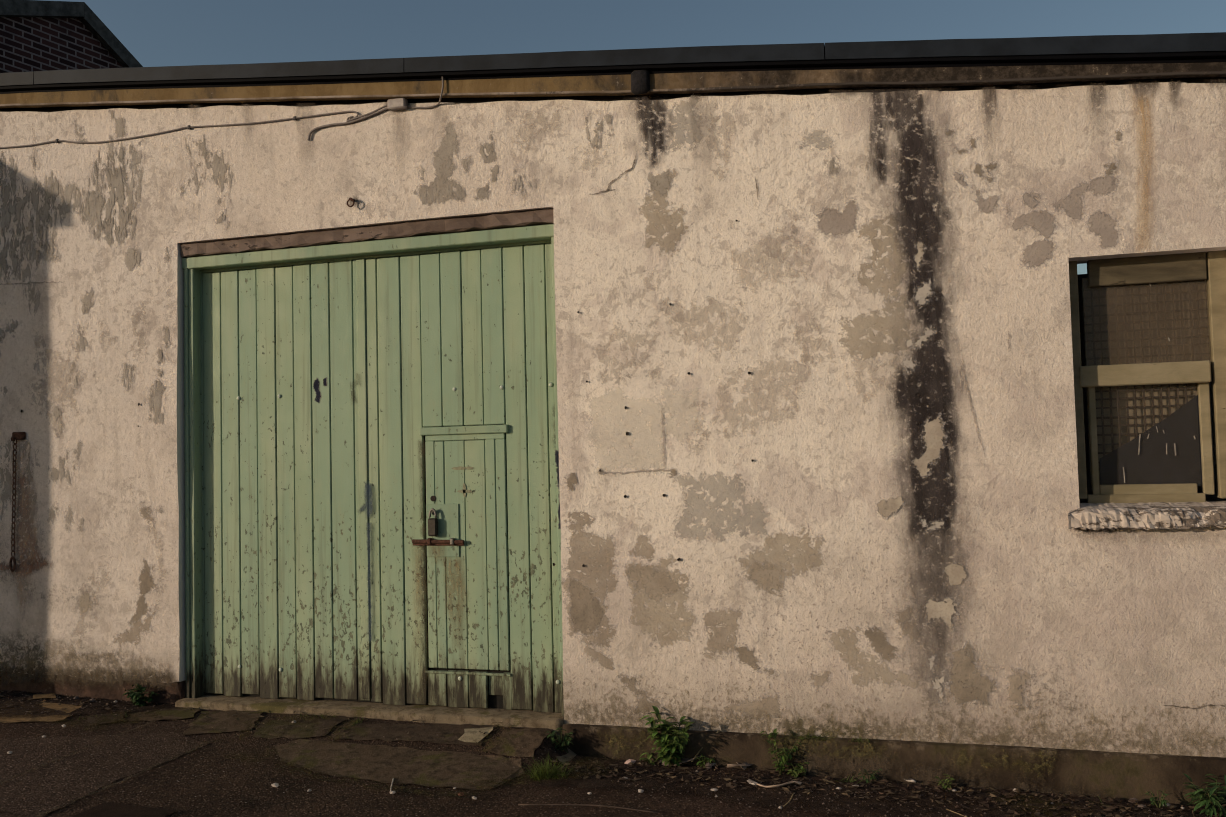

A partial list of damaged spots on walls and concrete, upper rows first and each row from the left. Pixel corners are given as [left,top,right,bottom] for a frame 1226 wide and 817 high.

peeling [0,110,145,313]
peeling [414,122,536,205]
peeling [585,113,616,149]
damp [637,94,668,165]
peeling [639,169,689,257]
peeling [799,130,840,174]
peeling [946,127,1121,271]
peeling [138,326,169,427]
damp [830,87,959,656]
peeling [670,468,825,597]
peeling [553,510,776,717]
peeling [830,563,1033,709]